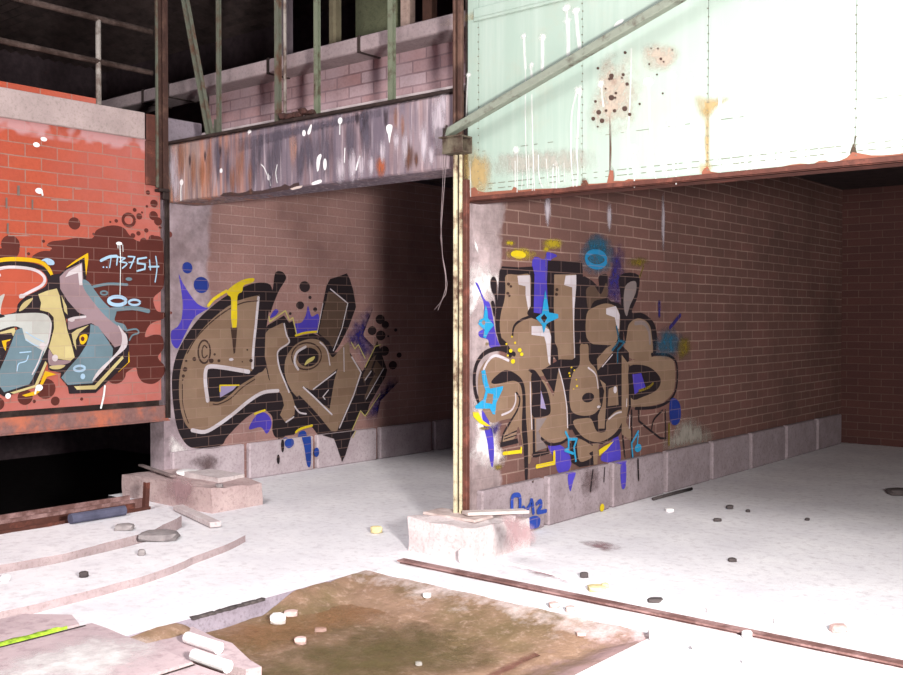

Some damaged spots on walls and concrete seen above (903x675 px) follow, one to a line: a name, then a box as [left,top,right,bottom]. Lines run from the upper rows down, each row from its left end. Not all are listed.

rust [405,148,418,169]
rust [701,100,718,168]